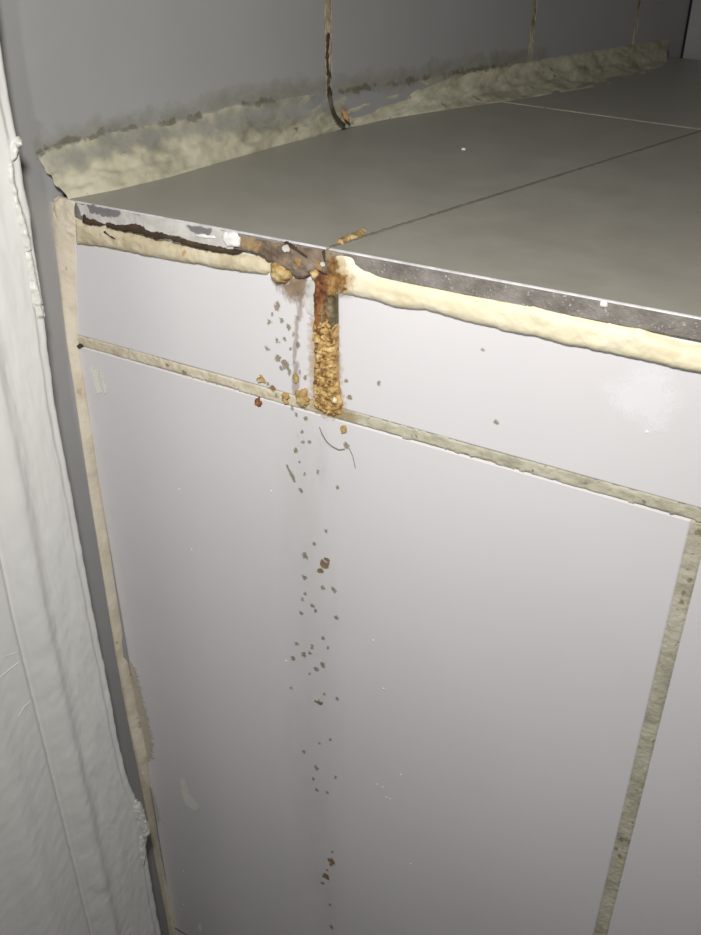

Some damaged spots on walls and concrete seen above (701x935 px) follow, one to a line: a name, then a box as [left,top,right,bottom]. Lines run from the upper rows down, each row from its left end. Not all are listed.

rust [270,256,347,434]